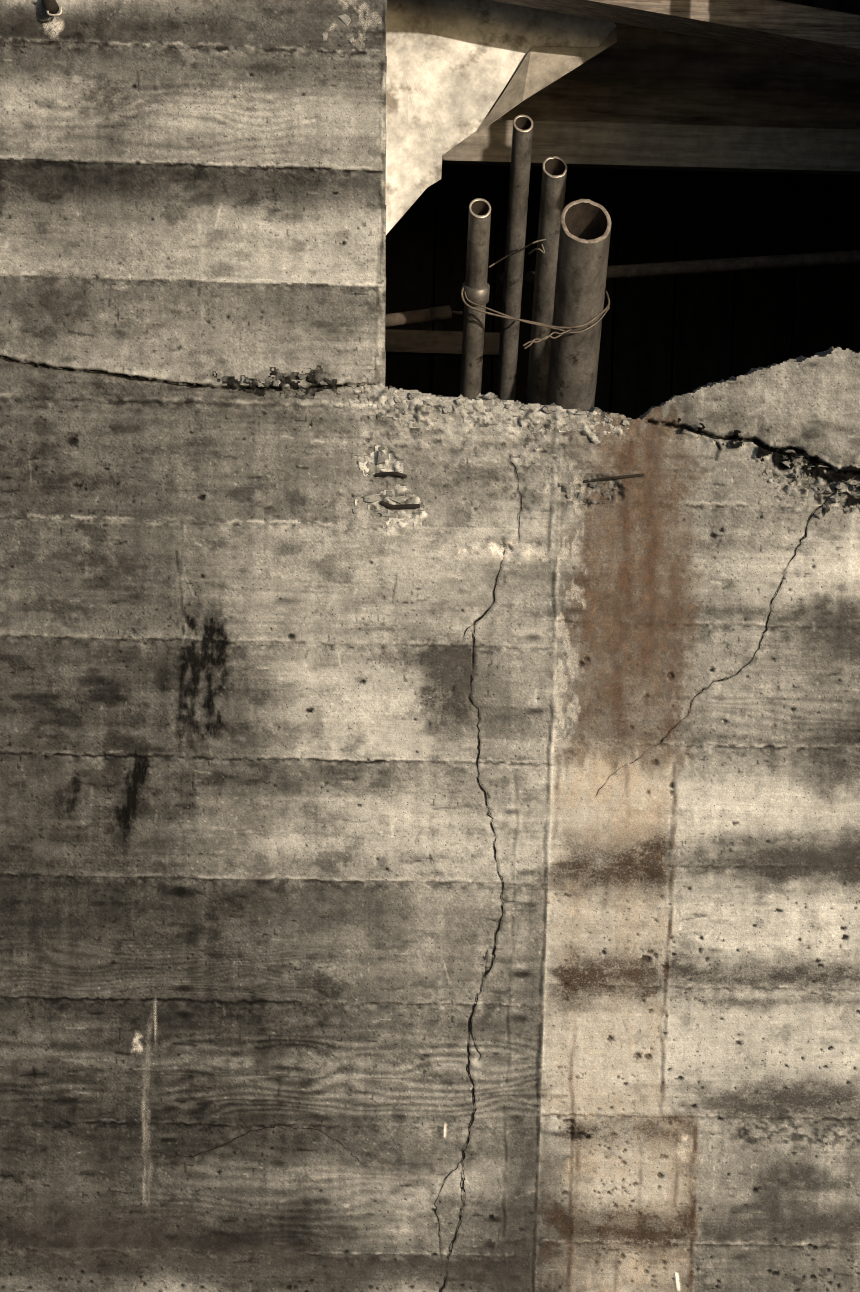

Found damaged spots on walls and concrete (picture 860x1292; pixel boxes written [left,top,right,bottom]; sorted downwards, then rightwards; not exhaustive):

crack [0,355,365,392]
spalling [213,365,632,445]
spalling [723,430,743,450]
spalling [353,445,428,530]
spalling [559,472,644,507]
spalling [756,447,860,520]
corrosion [565,404,700,845]
crack [594,423,858,798]
water stain [176,614,230,739]
crack [434,458,522,1292]